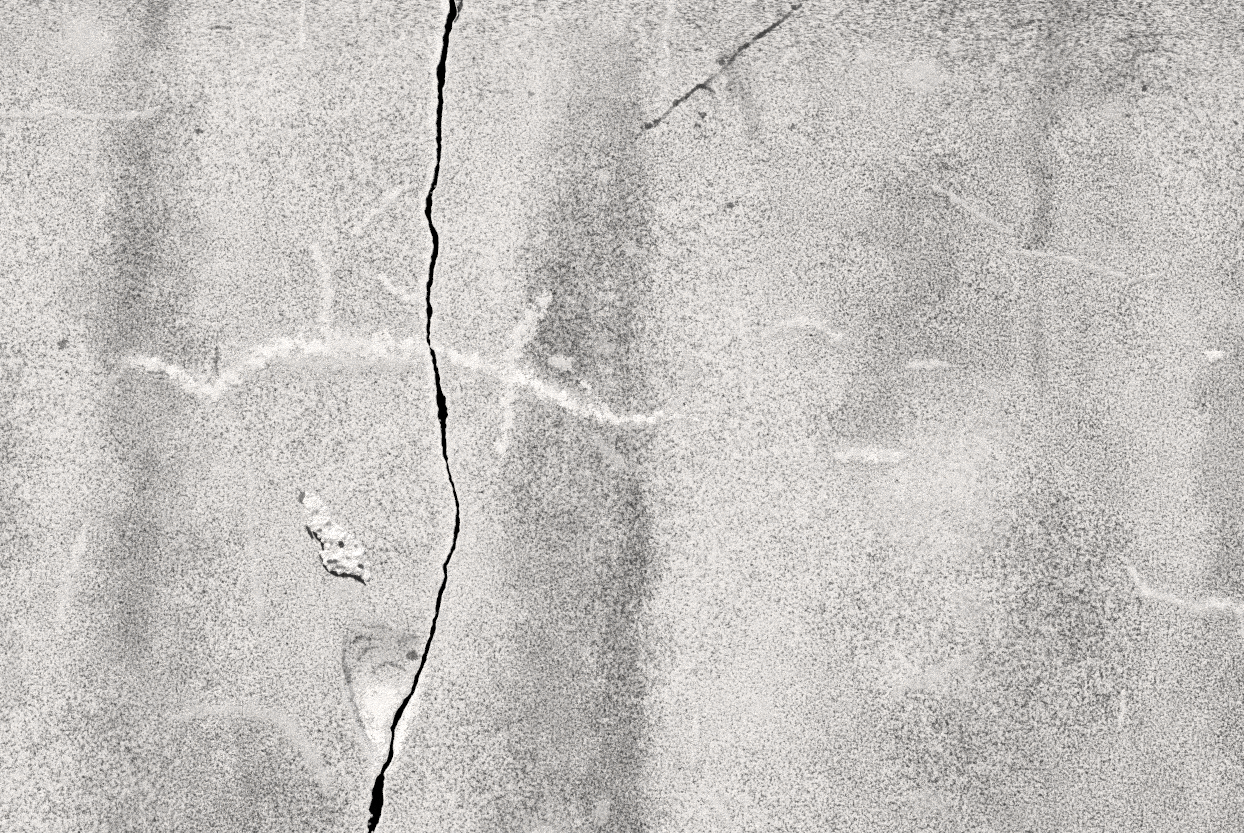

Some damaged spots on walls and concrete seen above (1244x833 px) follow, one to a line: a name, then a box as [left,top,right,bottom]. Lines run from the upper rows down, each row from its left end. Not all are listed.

crack [363,0,467,833]
crack [645,4,802,128]